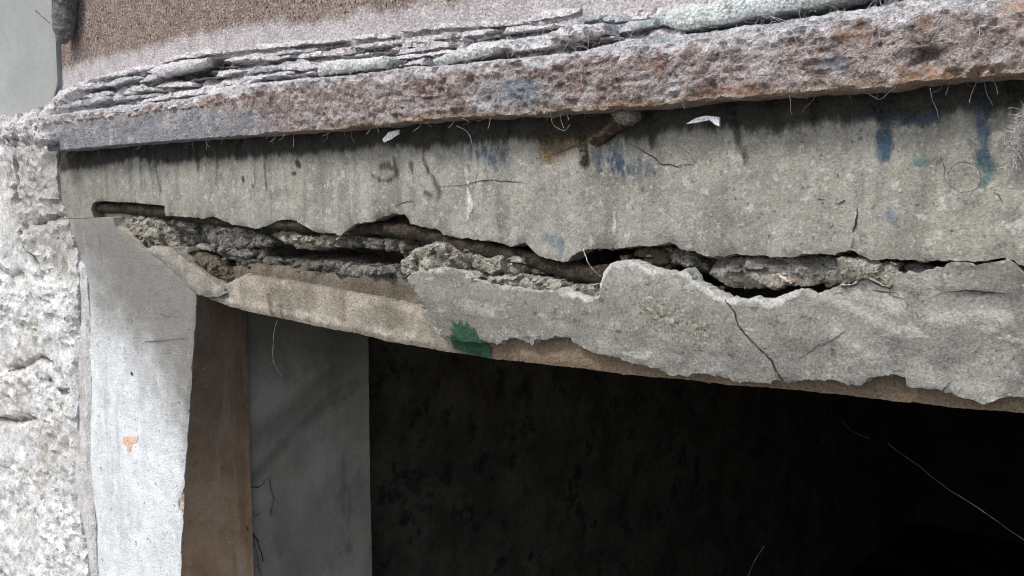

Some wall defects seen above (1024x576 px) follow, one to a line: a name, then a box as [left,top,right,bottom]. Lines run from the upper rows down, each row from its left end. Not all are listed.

peeling [382,130,400,143]
rust [44,0,1024,162]
water stain [59,80,1024,185]
peeling [686,116,720,126]
spalling [95,202,946,307]
peeling [283,309,433,342]
crack [725,300,784,381]